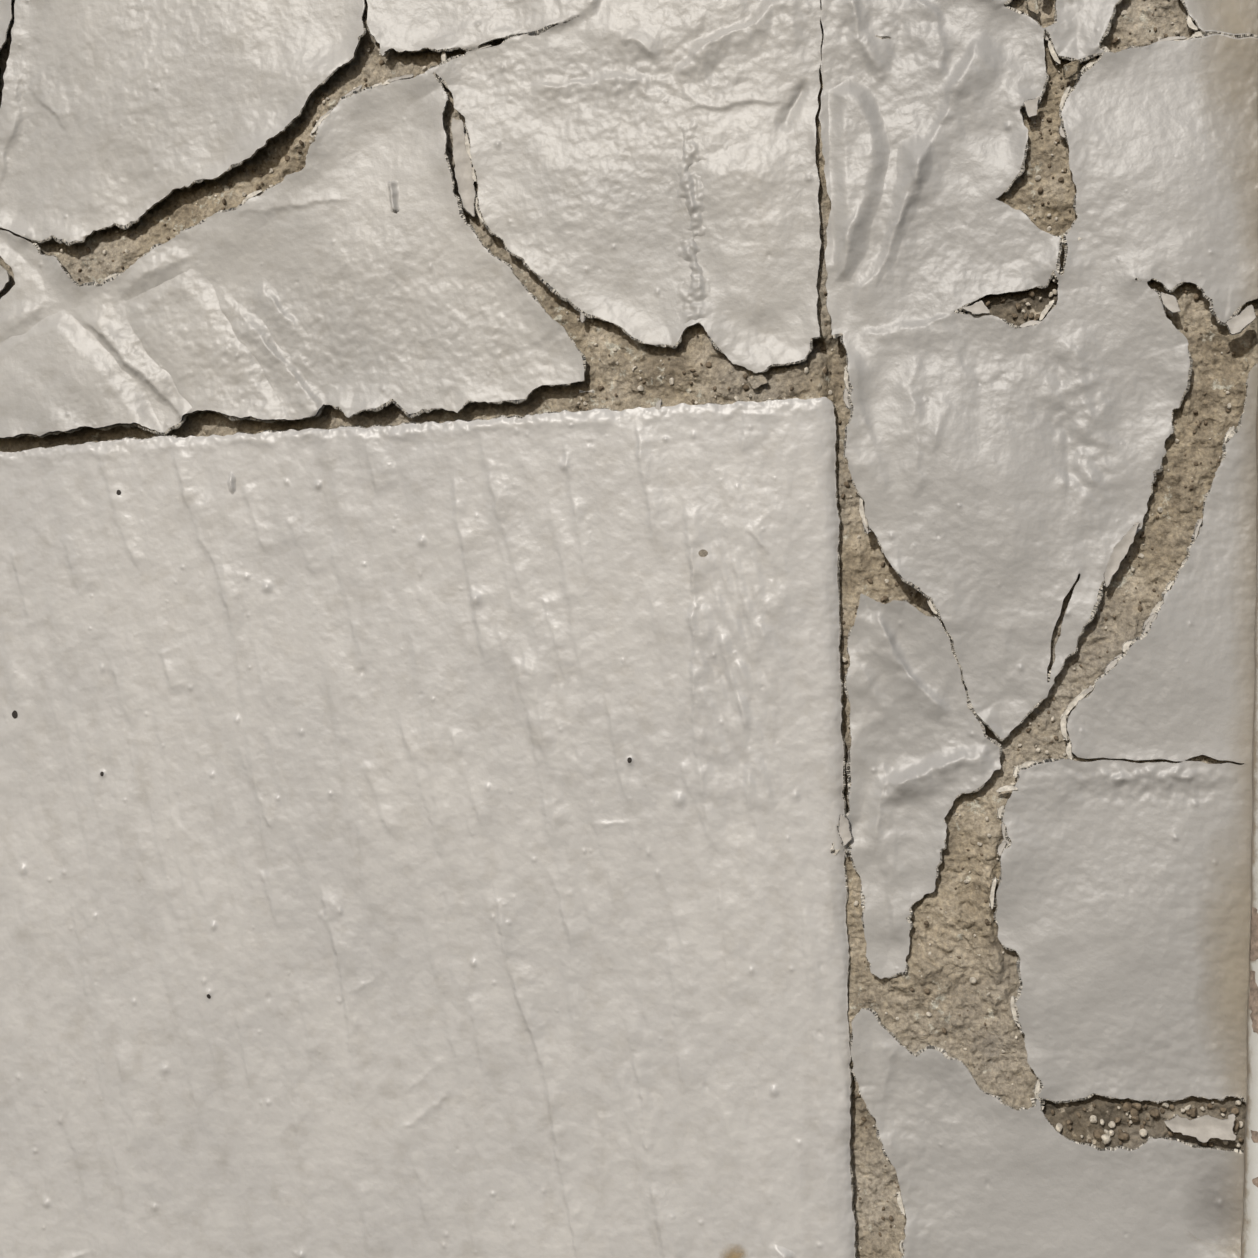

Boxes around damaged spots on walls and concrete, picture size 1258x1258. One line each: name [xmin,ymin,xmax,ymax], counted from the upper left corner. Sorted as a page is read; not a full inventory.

crack [0,0,15,107]
crack [0,227,41,299]
peeling [32,15,579,287]
crack [815,0,836,347]
peeling [996,0,1258,284]
spalling [563,278,1258,1258]